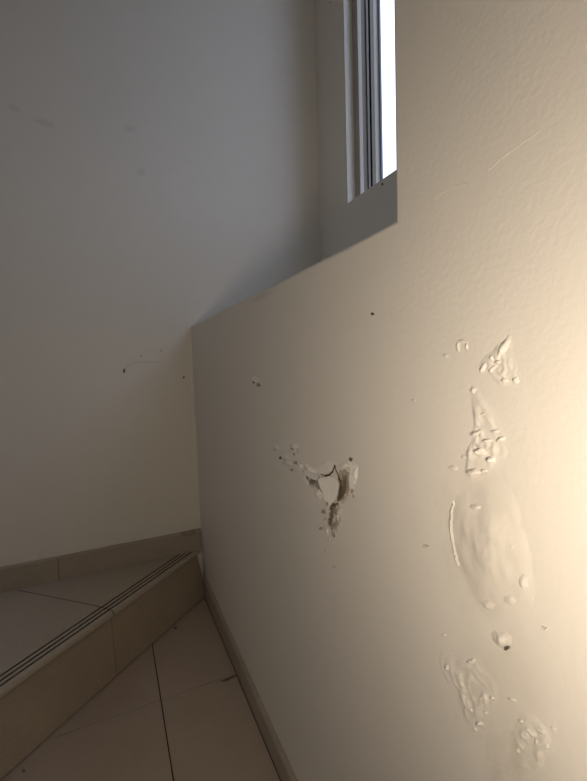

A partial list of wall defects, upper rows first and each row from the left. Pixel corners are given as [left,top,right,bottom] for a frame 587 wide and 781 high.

peeling [273,441,359,551]